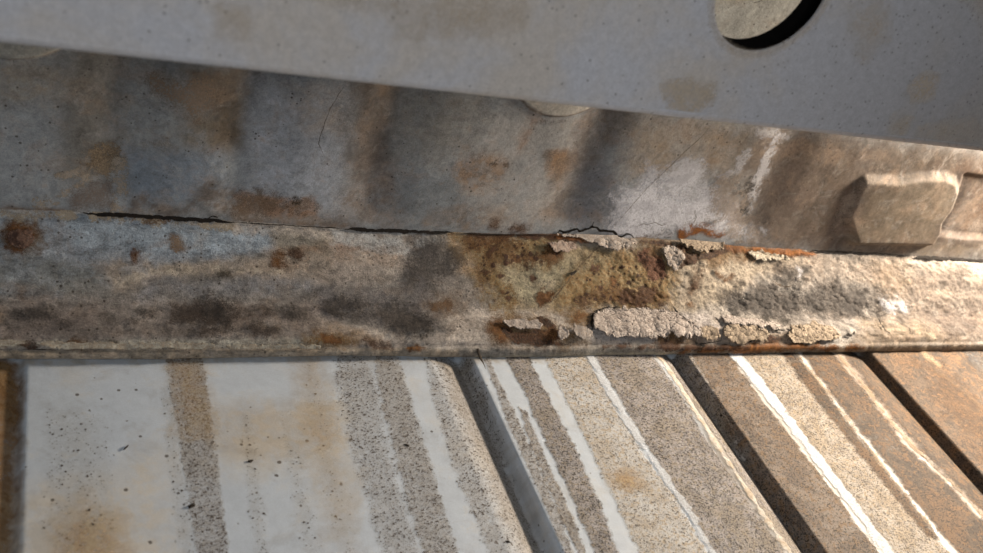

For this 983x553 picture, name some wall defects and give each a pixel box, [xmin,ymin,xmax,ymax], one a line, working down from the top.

leakage [605,133,780,247]
corrosion [0,220,42,254]
corrosion [269,247,305,269]
crack [83,169,667,306]
crack [807,250,983,262]
corrosion [448,218,816,348]
leakage [166,288,242,344]
leakage [323,295,455,337]
peeling [557,305,841,345]
corrosion [603,331,864,355]